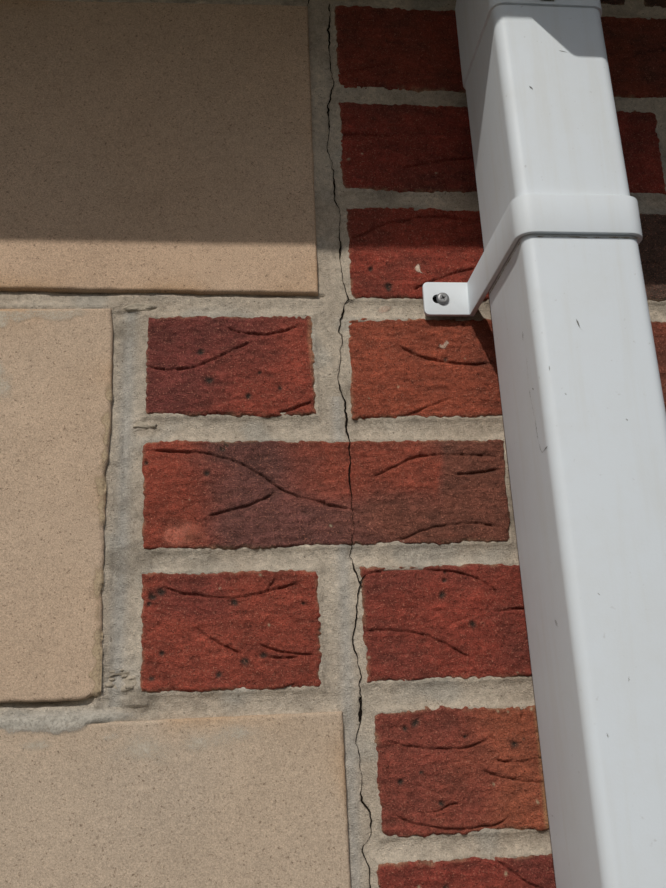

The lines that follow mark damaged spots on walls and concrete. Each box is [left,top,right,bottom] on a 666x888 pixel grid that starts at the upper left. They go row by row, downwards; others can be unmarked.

crack [308,0,372,888]